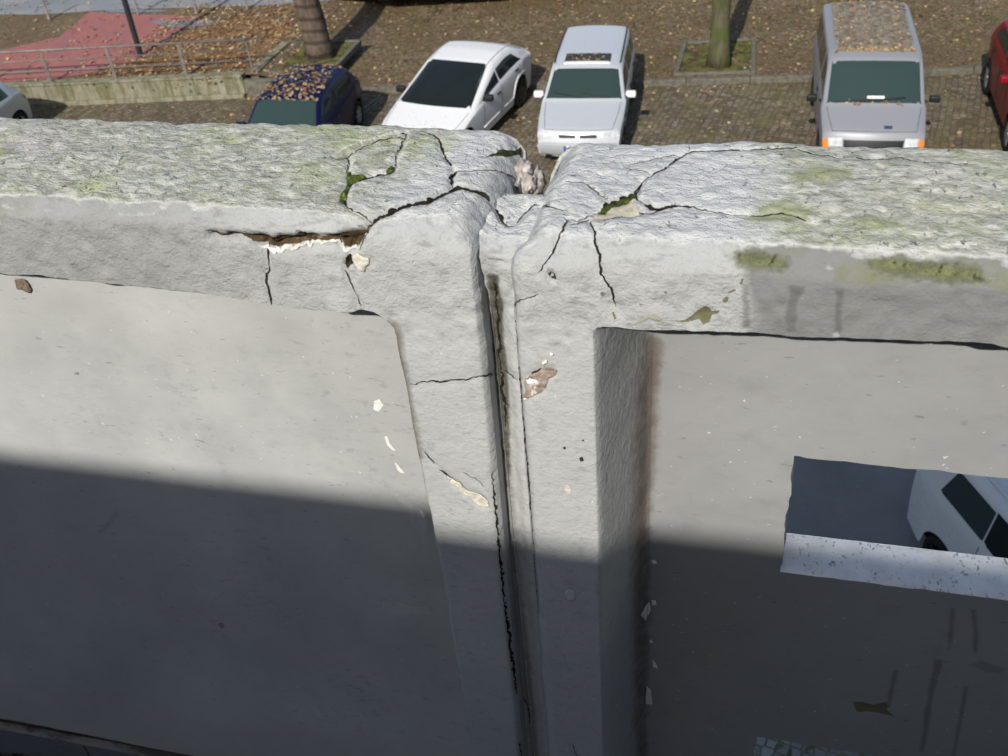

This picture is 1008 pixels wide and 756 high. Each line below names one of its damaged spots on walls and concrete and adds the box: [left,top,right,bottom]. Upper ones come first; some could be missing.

spalling [486,147,547,195]
crack [264,243,272,305]
spalling [522,353,557,401]
crack [330,131,979,613]
spalling [424,451,489,507]
crack [491,474,531,756]